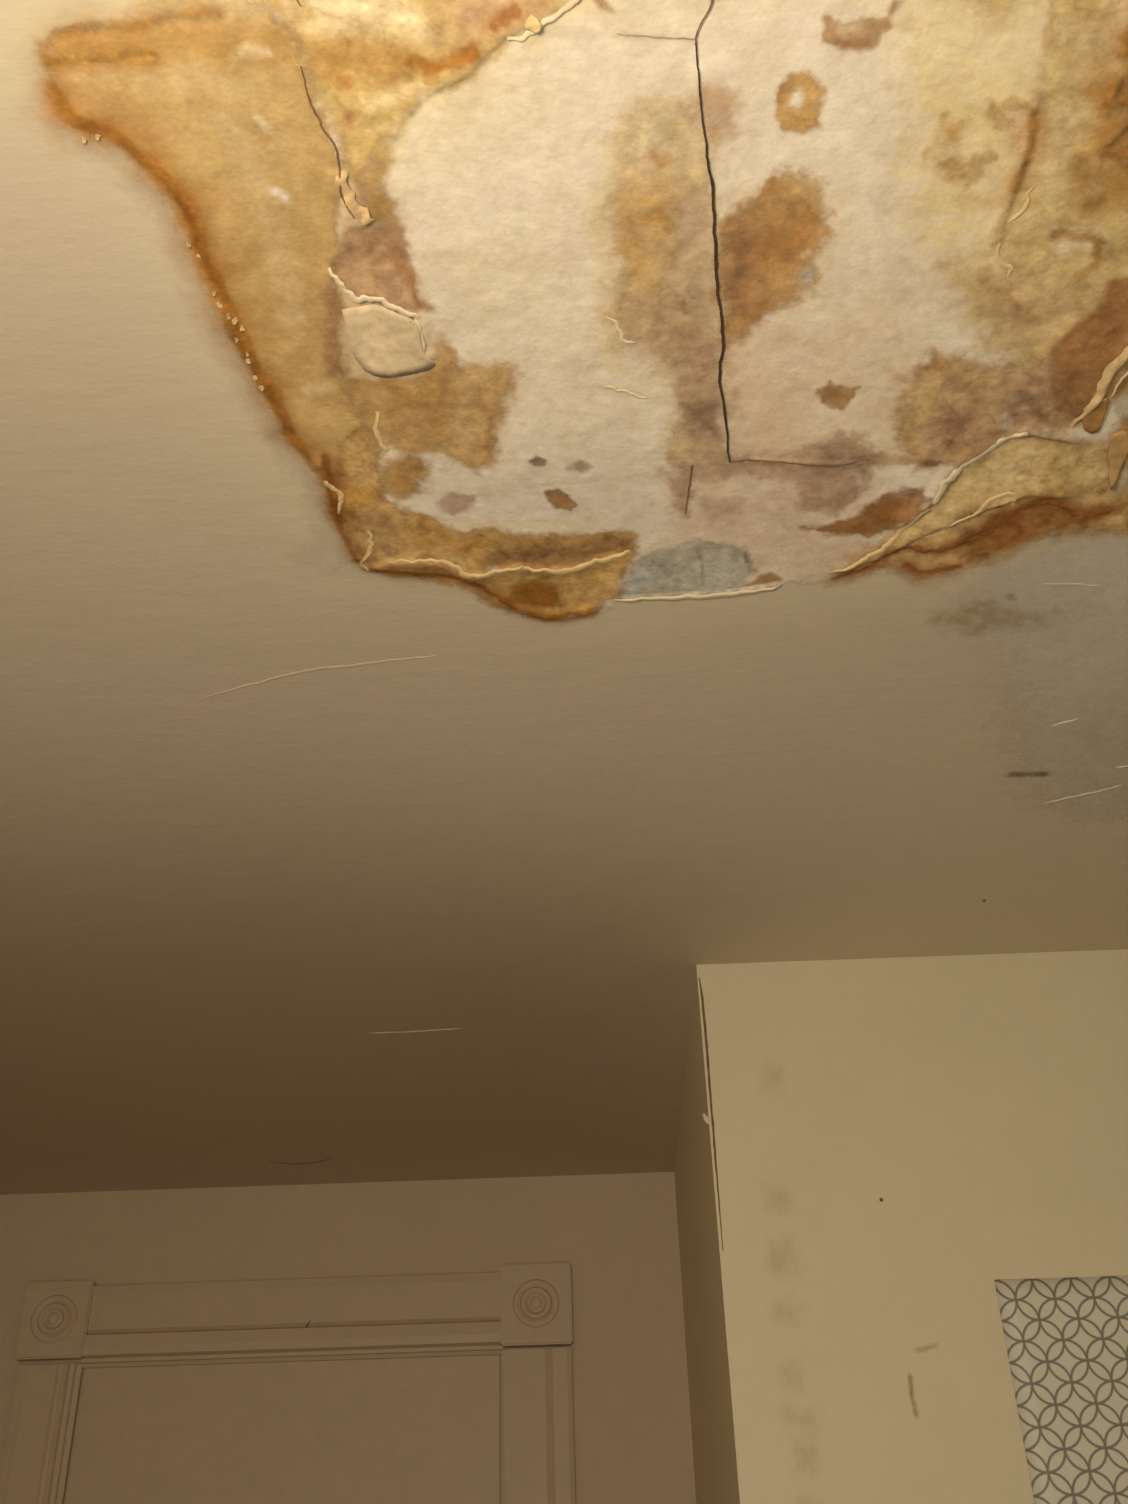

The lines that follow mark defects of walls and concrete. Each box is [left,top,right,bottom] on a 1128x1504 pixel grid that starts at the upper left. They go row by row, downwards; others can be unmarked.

leakage [39,0,637,621]
crack [685,465,693,514]
peeling [259,0,1128,617]
crack [616,0,869,466]
leakage [747,573,781,586]
leakage [605,0,1128,580]